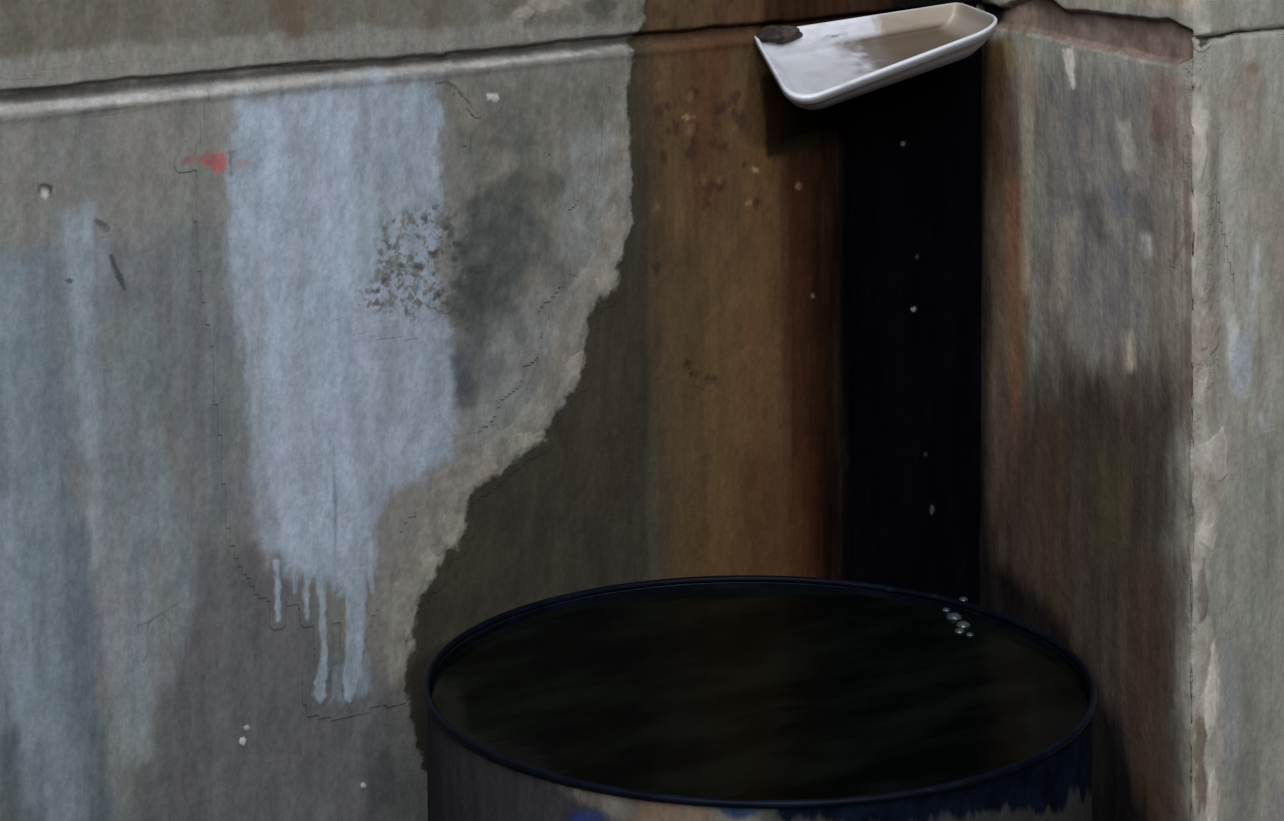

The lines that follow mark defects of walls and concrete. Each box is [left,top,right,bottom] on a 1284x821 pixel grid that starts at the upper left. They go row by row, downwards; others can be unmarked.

crack [78,101,140,118]
peeling [334,179,498,341]
water stain [237,87,639,821]
spalling [1007,0,1229,821]
water stain [1007,28,1284,821]
crack [1193,23,1284,51]